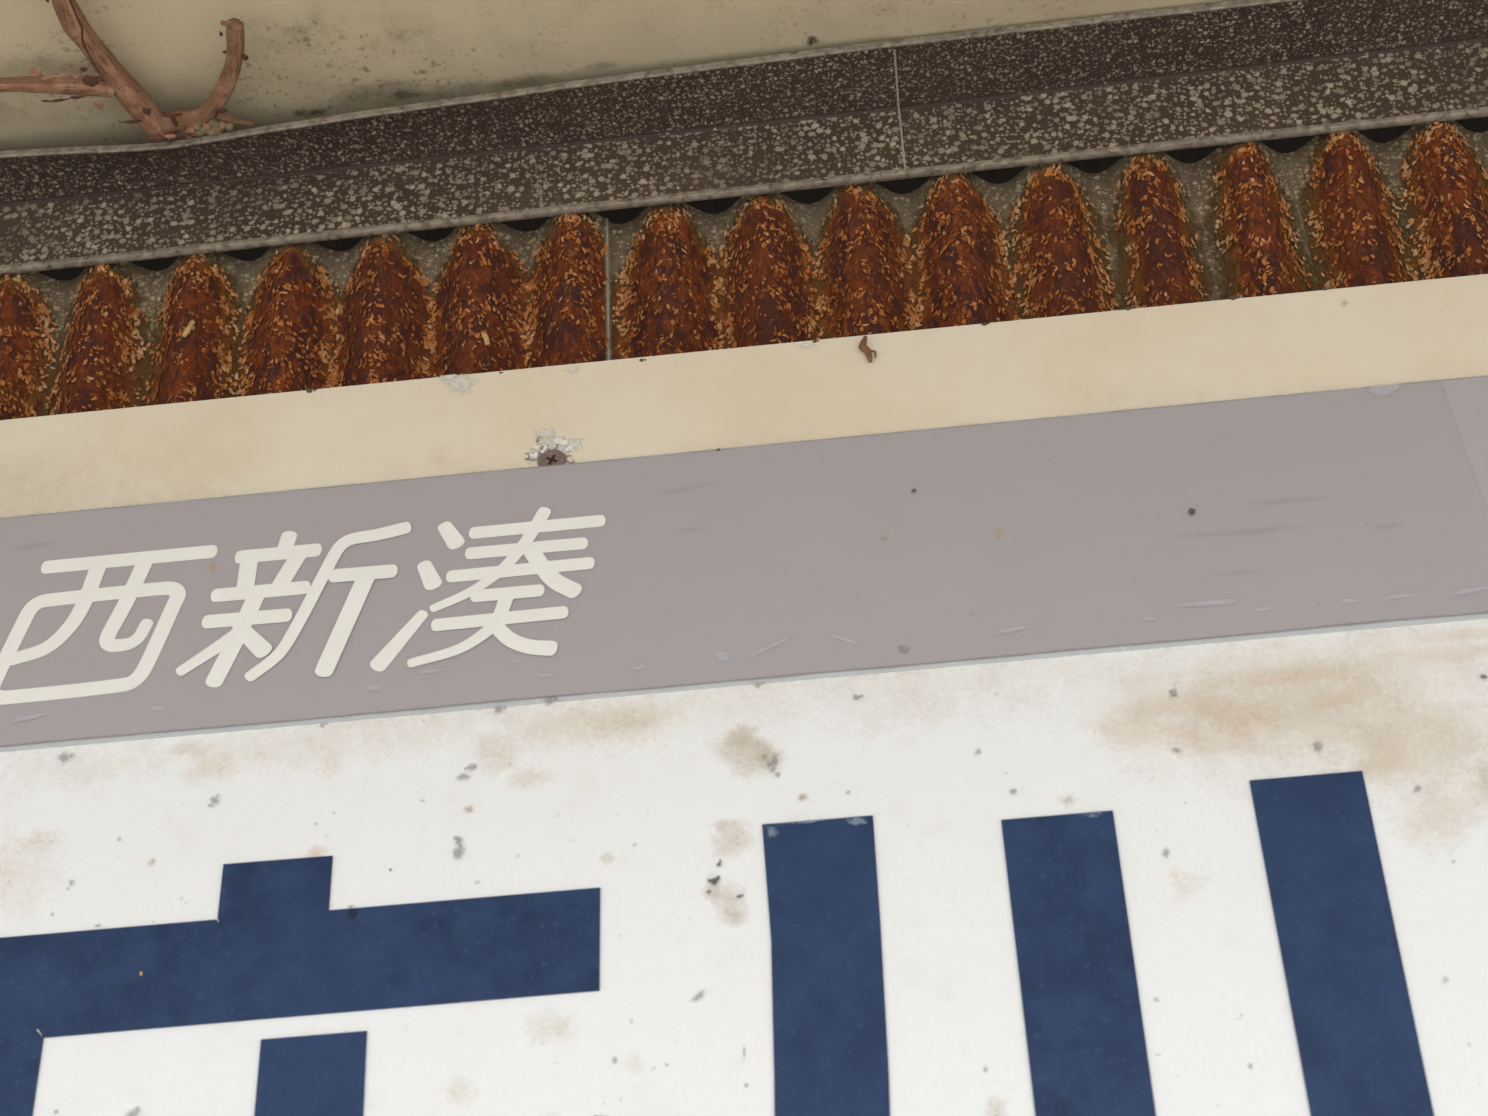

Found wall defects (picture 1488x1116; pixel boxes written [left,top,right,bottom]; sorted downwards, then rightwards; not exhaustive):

rust [0,122,1488,420]